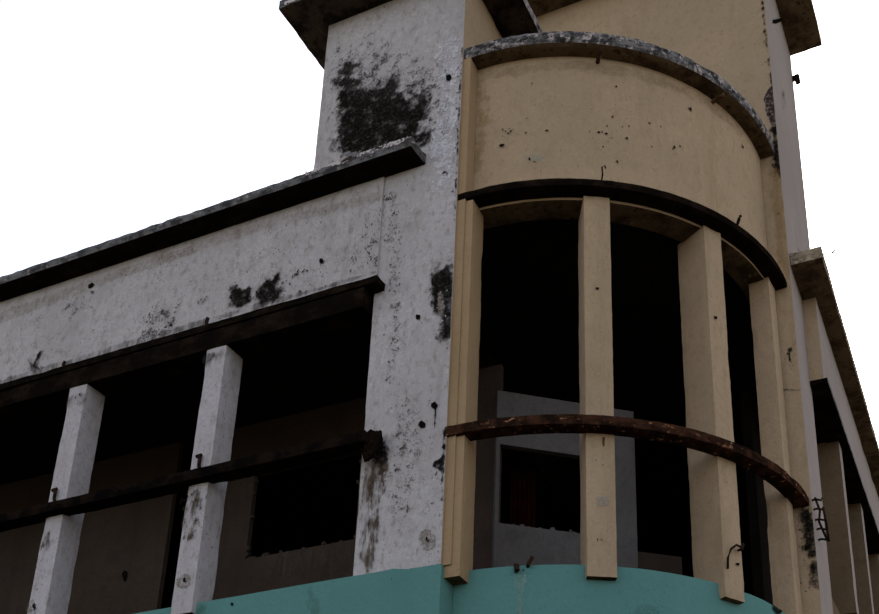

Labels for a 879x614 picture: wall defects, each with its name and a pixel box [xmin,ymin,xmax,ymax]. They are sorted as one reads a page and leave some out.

damp [325,32,448,153]
damp [770,127,781,176]
damp [229,269,309,308]
damp [430,264,453,348]
damp [375,442,390,481]
damp [799,507,818,592]